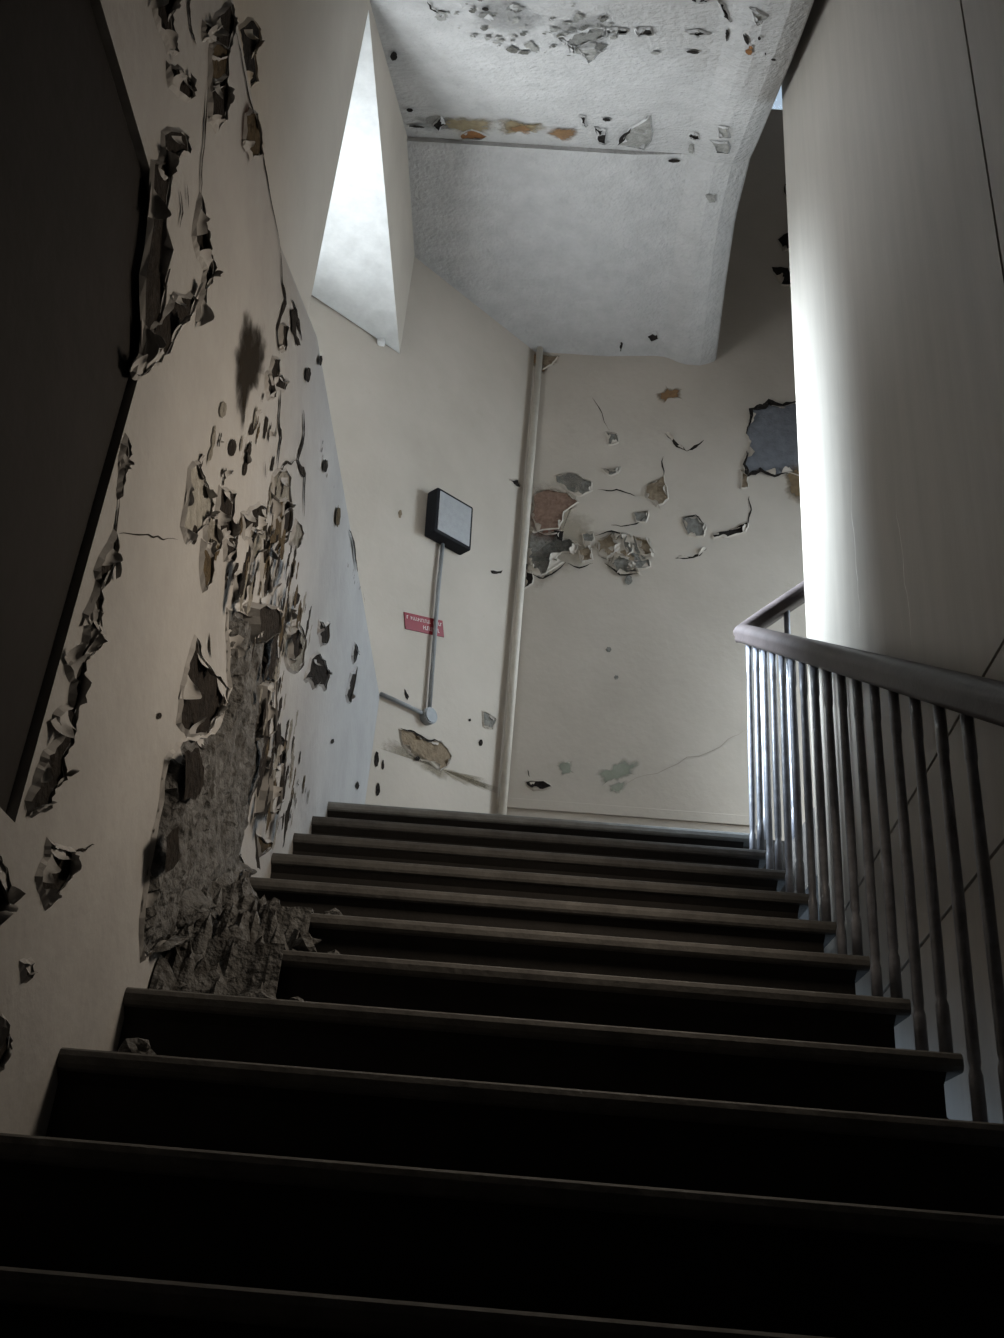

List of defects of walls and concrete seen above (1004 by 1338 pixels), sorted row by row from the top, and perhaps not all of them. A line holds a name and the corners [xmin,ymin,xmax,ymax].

peeling [427,0,654,63]
peeling [685,0,776,61]
peeling [579,114,654,150]
peeling [129,0,265,380]
spalling [739,399,800,500]
peeling [524,458,669,589]
spalling [681,515,707,538]
peeling [24,433,134,818]
spalling [139,394,332,963]
peeling [398,728,452,771]
spalling [0,837,94,926]
peeling [0,1011,13,1072]